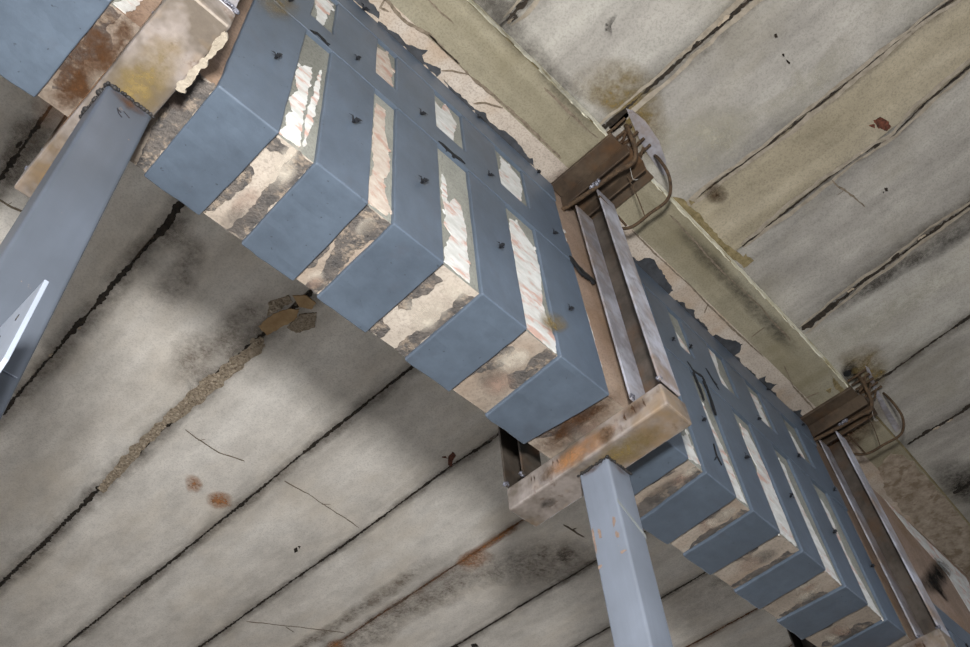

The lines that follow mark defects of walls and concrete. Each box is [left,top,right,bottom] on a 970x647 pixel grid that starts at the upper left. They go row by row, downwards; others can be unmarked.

spalling [52,0,142,92]
spalling [136,73,216,172]
spalling [97,103,392,493]
crack [292,289,313,309]
crack [216,332,266,373]
crack [0,486,100,587]
corrosion [211,494,228,506]
crack [63,365,523,647]
damp [299,575,410,647]
crack [456,559,597,645]
crack [661,572,706,599]